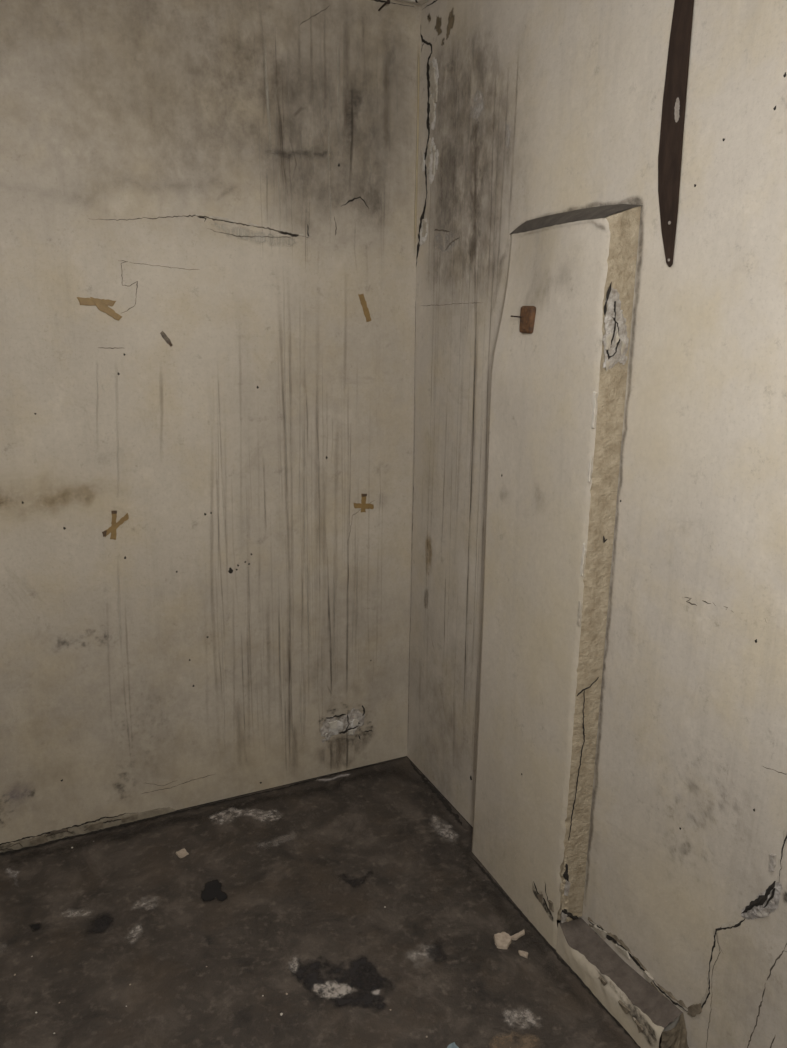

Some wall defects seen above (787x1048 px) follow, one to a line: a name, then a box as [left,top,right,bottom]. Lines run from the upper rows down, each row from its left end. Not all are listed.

crack [374,0,437,10]
crack [416,35,439,265]
crack [92,197,369,245]
flaking render [603,281,629,371]
flaking render [320,705,372,751]
crack [777,825,787,883]
flaking render [533,855,579,923]
flaking render [741,853,787,920]
peeling [618,1000,656,1044]